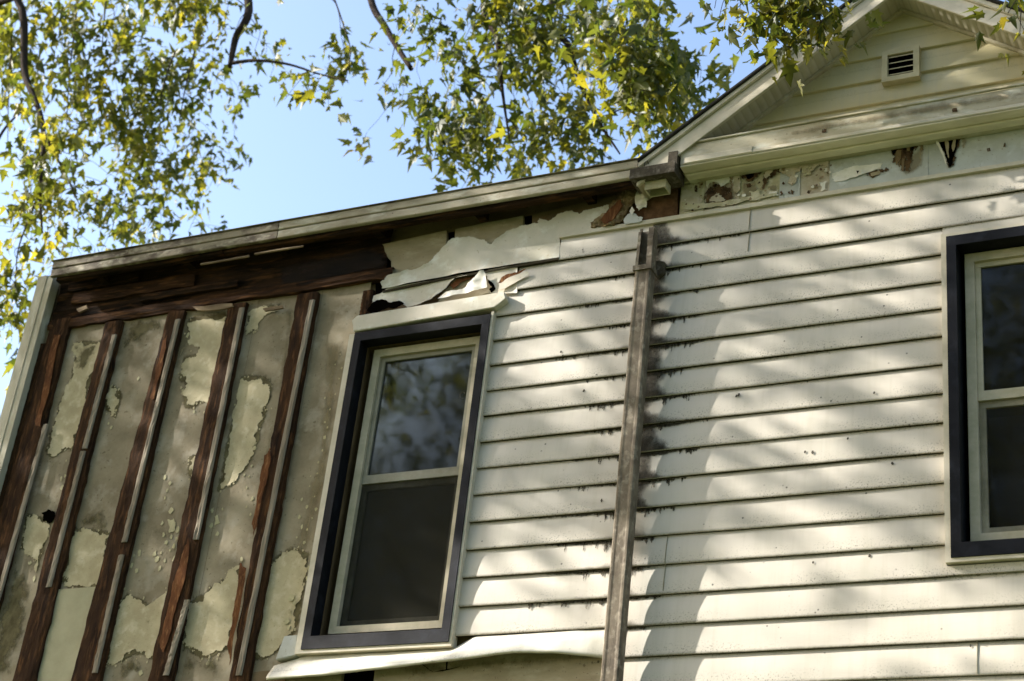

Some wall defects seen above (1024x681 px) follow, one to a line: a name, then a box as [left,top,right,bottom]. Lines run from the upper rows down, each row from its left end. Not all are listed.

peeling [600,199,643,225]
peeling [681,160,882,212]
peeling [449,276,475,289]
peeling [46,340,101,490]
peeling [178,313,227,413]
peeling [217,375,272,516]
leakage [636,223,740,517]
peeling [21,514,50,582]
peeling [62,527,110,588]
peeling [255,393,336,660]
peeling [106,587,167,676]
peeling [182,557,243,665]